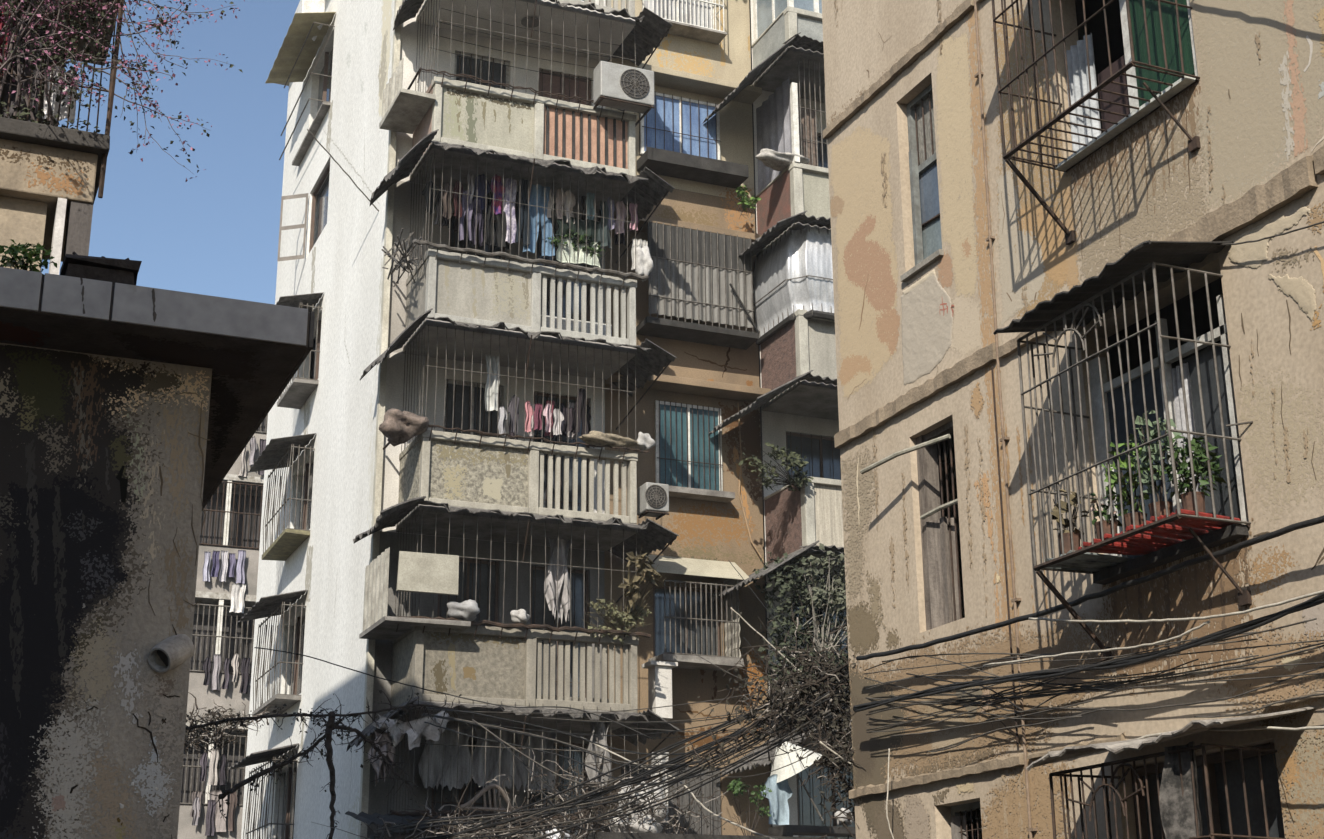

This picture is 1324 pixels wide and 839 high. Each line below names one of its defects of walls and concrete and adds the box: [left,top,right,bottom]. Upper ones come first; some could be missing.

crack [685,347,747,378]
peeling [830,195,844,217]
peeling [842,31,982,357]
damp [988,0,1299,319]
damp [0,285,261,839]